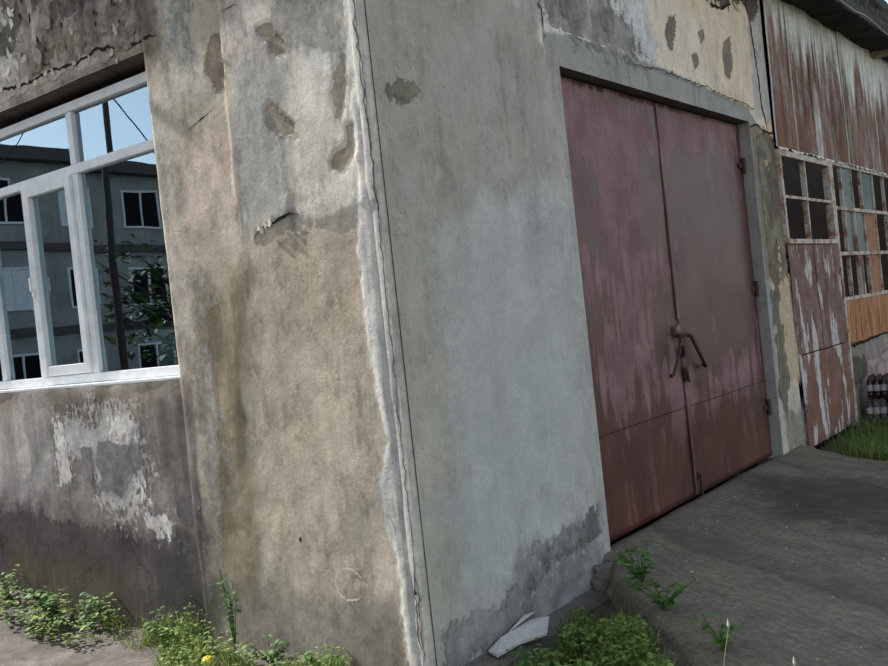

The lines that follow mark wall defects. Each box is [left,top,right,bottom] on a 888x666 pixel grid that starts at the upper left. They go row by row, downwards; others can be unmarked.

spalling [0,5,125,105]
crack [3,25,157,91]
spalling [257,22,289,56]
spalling [264,103,297,138]
spalling [330,53,355,173]
peeling [543,0,677,71]
rust [768,13,888,174]
peeling [51,387,193,557]
leakage [0,262,393,666]
leakage [441,504,602,666]